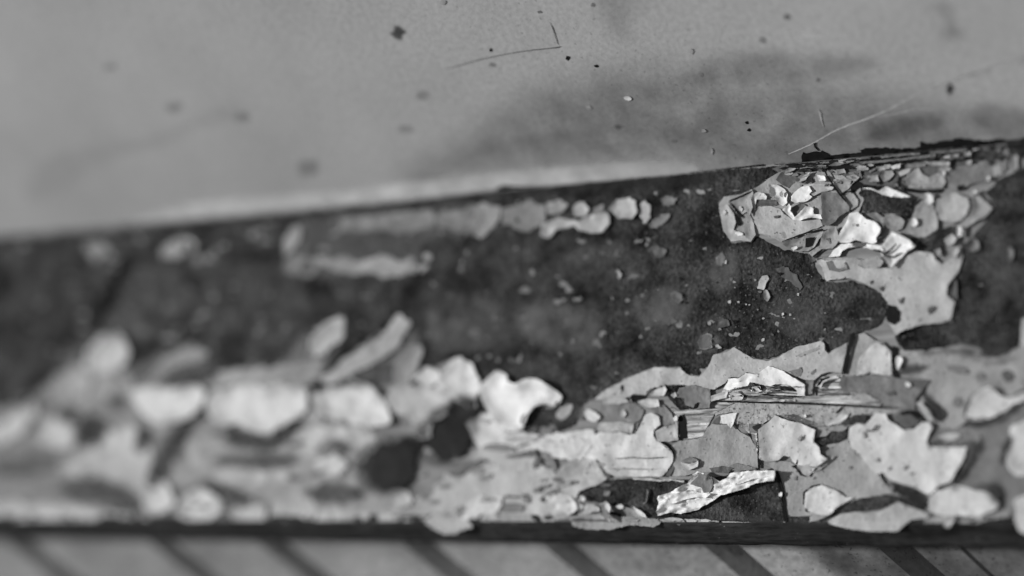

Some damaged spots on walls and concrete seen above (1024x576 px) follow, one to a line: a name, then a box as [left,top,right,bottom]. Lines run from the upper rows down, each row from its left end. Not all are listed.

peeling [0,154,1024,535]